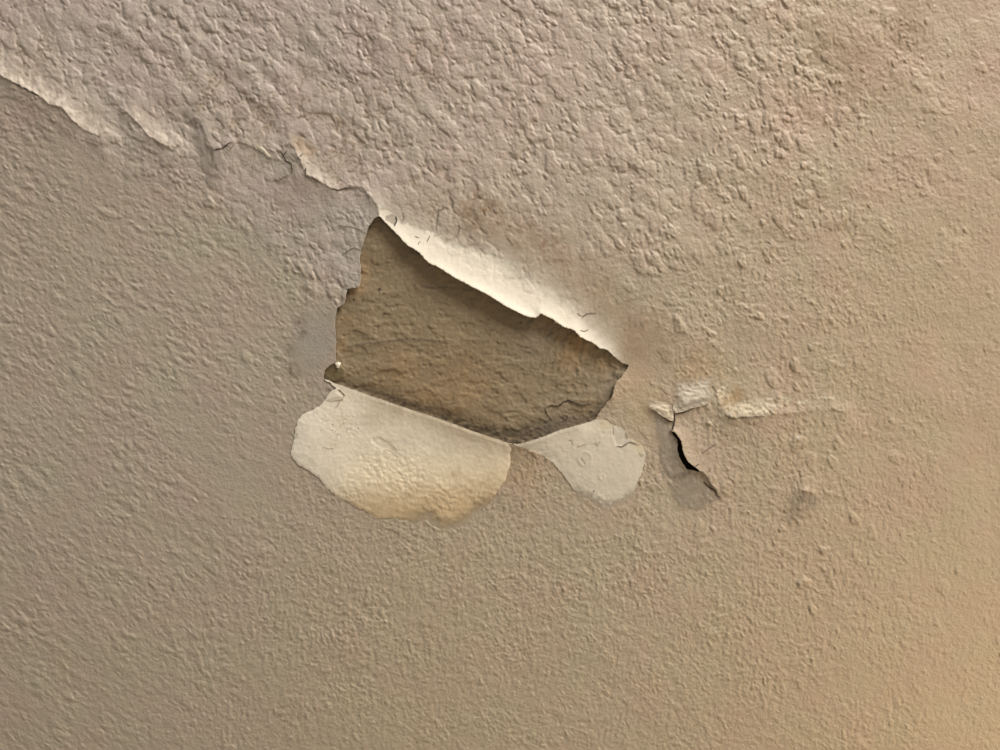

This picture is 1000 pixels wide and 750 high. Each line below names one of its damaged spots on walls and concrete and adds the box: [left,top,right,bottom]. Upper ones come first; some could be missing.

peeling [291,216,646,523]
crack [671,412,748,506]
peeling [649,372,865,509]